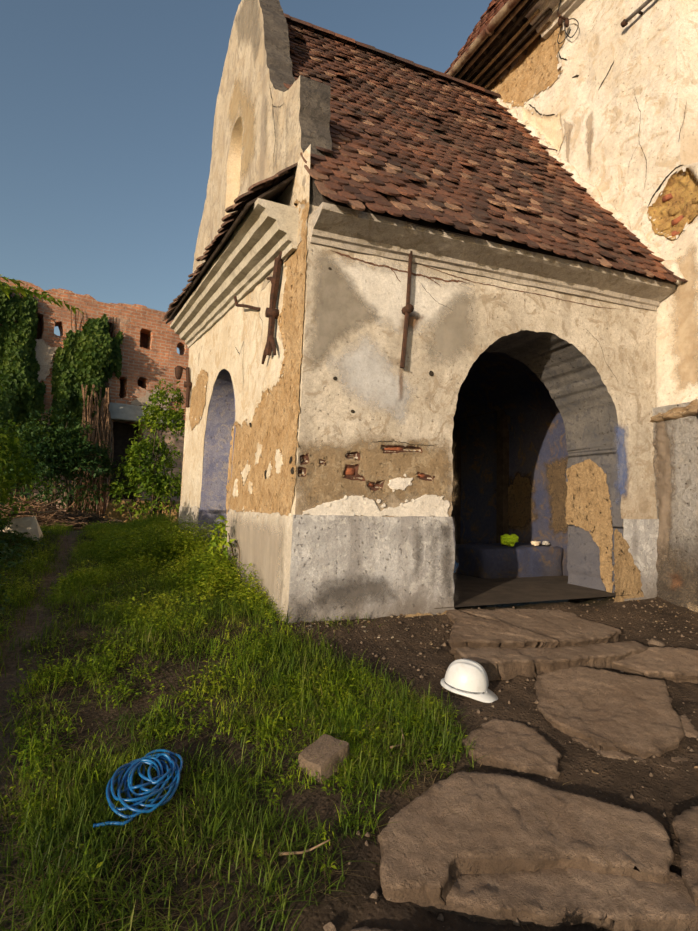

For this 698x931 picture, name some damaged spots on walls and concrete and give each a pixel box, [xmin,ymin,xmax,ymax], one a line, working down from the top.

spalling [647,166,698,240]
peeling [189,368,208,431]
peeling [226,199,451,518]
peeling [545,457,644,602]